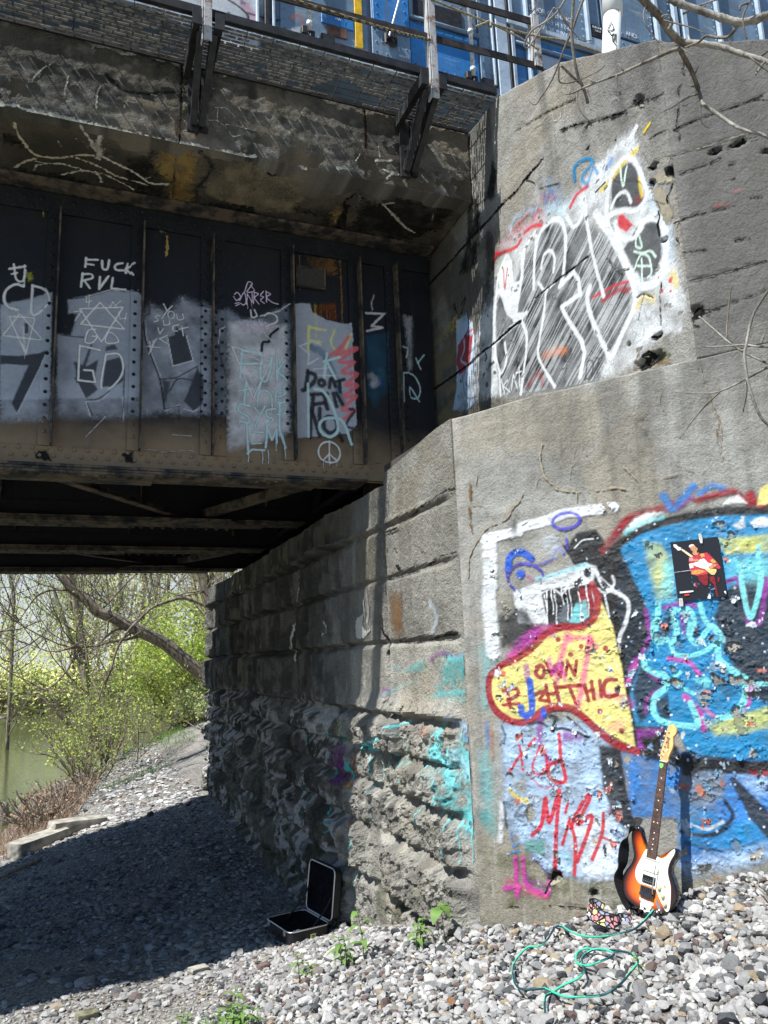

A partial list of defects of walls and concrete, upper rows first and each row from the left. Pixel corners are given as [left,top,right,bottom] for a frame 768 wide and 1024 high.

crack [514,97,635,133]
crack [612,64,768,253]
leakage [349,192,453,242]
crack [428,158,544,284]
crack [689,237,767,281]
spalling [639,333,670,371]